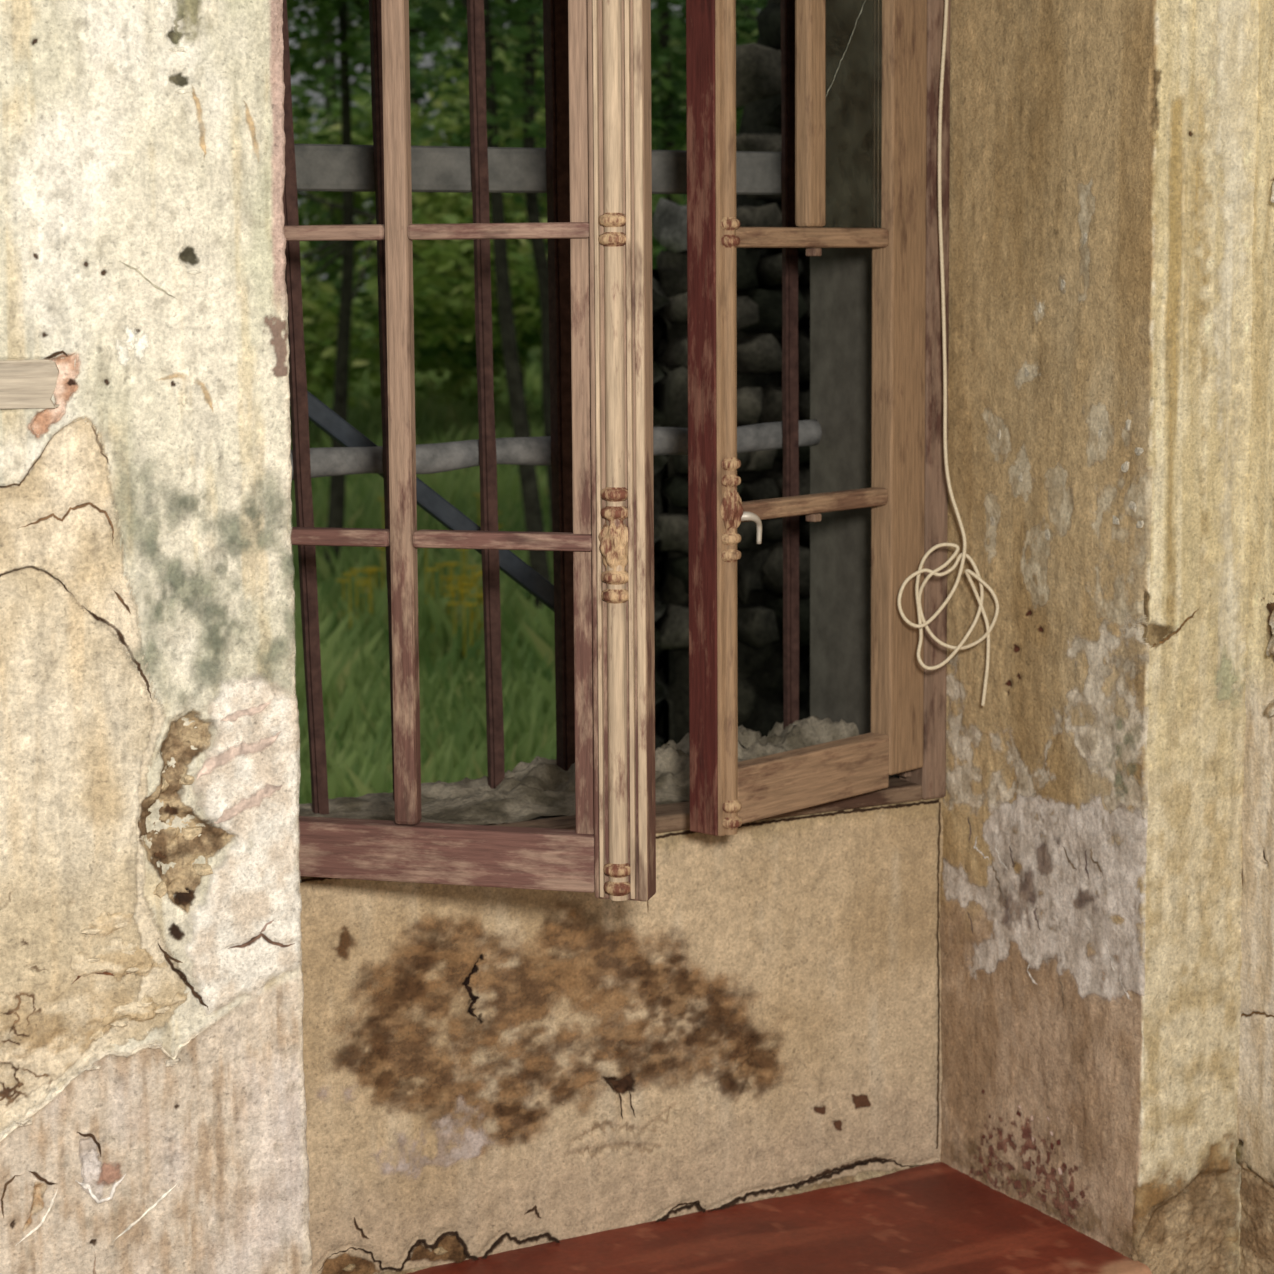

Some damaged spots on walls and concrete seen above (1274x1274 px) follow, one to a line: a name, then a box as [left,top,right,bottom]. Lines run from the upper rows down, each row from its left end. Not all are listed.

damp [174,0,200,43]
flaking render [1263,594,1274,660]
flaking render [0,351,236,1142]
peeling [942,402,1173,1007]
crack [0,940,49,1104]
damp [336,927,354,958]
crack [462,954,483,1023]
damp [339,904,778,1177]
crack [652,799,941,1224]
flaking render [75,1132,126,1204]
crack [319,1205,560,1271]
flaking render [1131,1161,1274,1274]